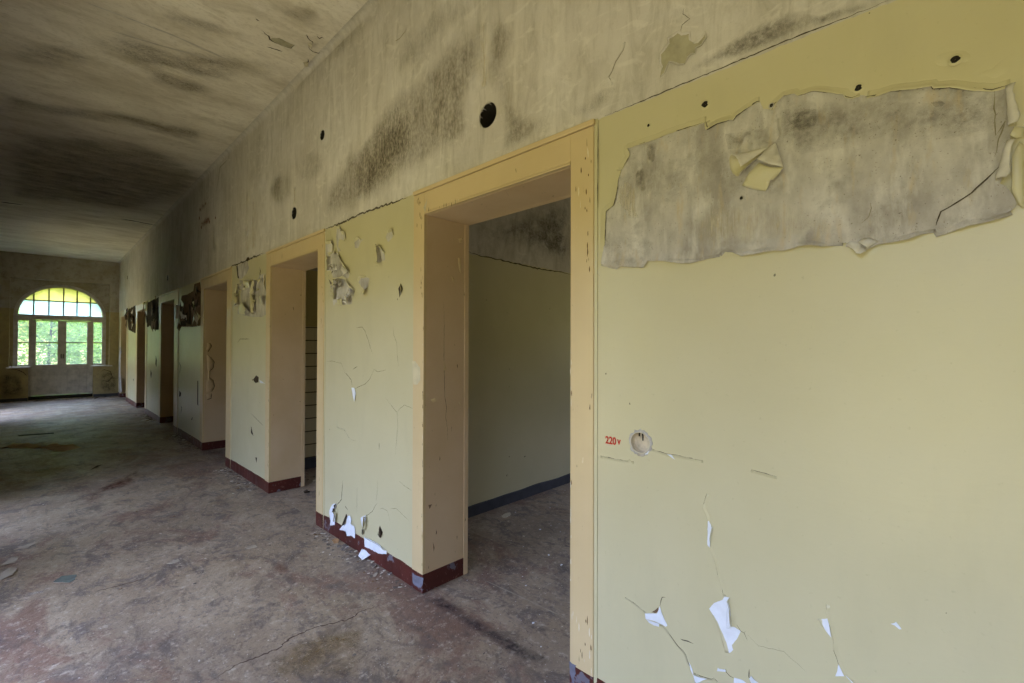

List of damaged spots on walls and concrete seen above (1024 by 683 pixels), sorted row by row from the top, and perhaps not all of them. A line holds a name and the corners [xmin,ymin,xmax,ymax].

peeling [659,9,707,77]
peeling [586,79,1024,272]
peeling [175,282,201,331]
peeling [233,257,266,317]
peeling [325,226,370,305]
crack [328,327,398,401]
peeling [329,483,387,554]
crack [625,493,803,683]
crack [219,604,383,676]
crack [817,604,855,683]